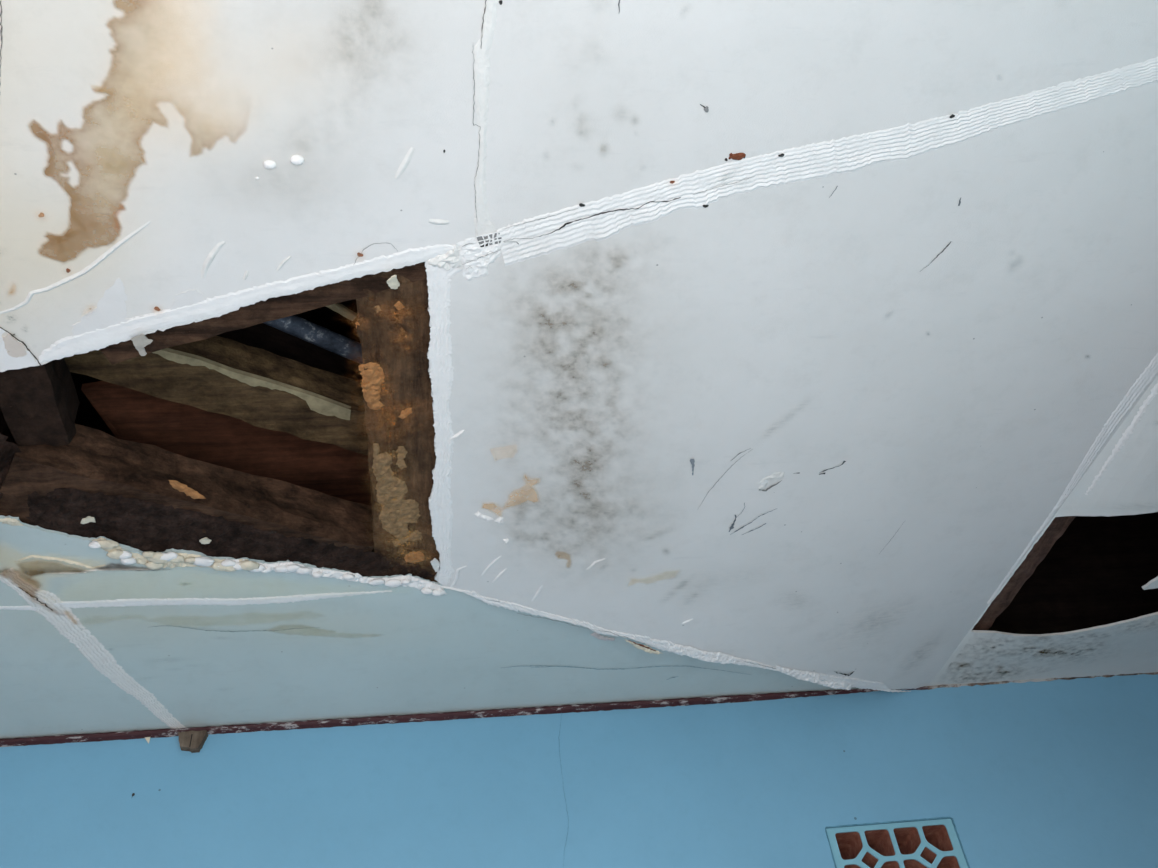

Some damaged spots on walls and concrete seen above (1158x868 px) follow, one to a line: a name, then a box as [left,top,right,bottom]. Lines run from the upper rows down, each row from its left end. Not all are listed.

water stain [115,0,141,18]
crack [0,1,8,86]
water stain [30,47,163,262]
crack [462,1,751,268]
peeling [387,275,400,289]
crack [0,327,42,366]
peeling [131,334,153,356]
water stain [571,449,596,500]
spalling [88,537,447,596]